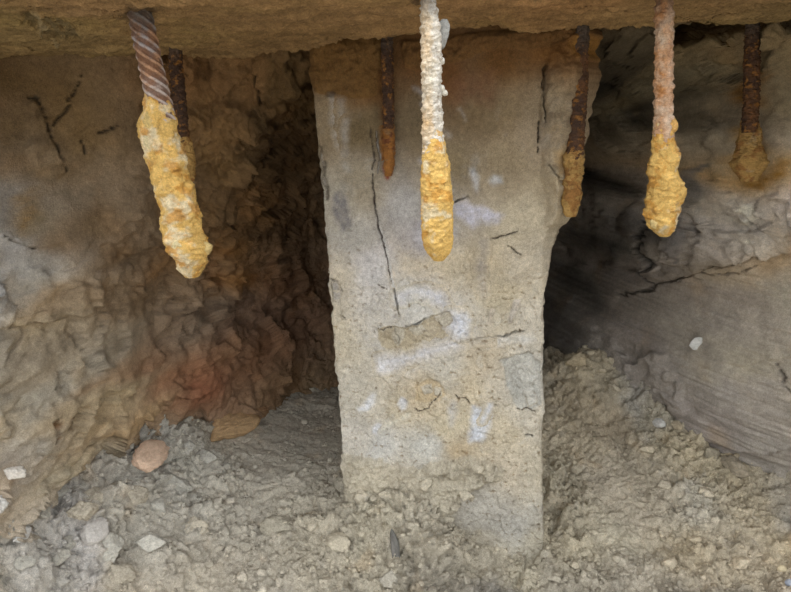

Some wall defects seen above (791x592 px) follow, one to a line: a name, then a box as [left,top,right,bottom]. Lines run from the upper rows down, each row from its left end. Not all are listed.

spalling [127,9,213,278]
spalling [329,277,343,303]
crack [370,128,400,332]
spalling [560,25,590,217]
rust [566,31,603,63]
spalling [642,0,718,237]
spalling [689,337,702,350]
spalling [728,22,770,182]